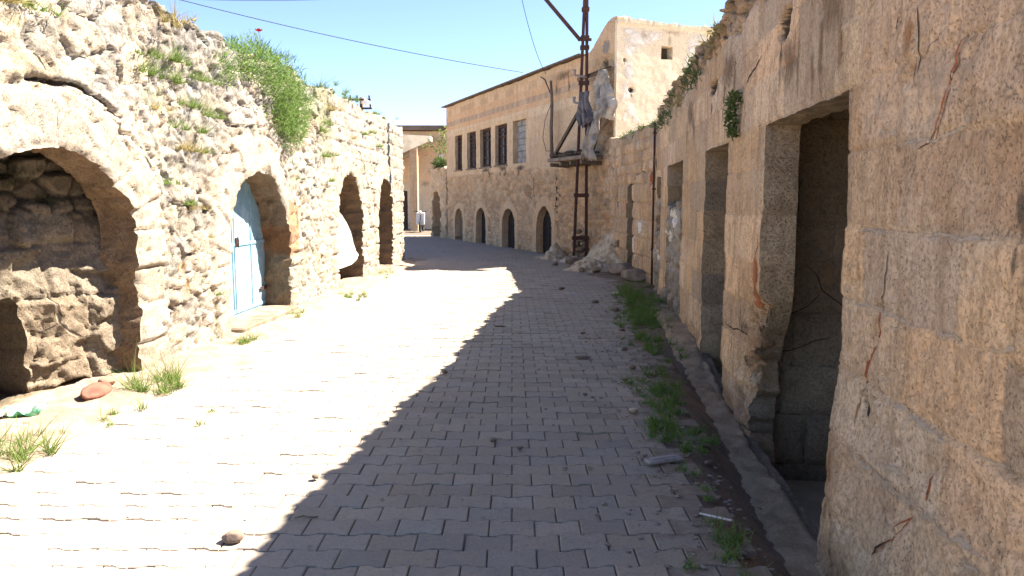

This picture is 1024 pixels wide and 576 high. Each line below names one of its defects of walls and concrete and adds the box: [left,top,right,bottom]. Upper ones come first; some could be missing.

crack [895,6,962,149]
crack [854,254,888,427]
crack [871,475,934,555]